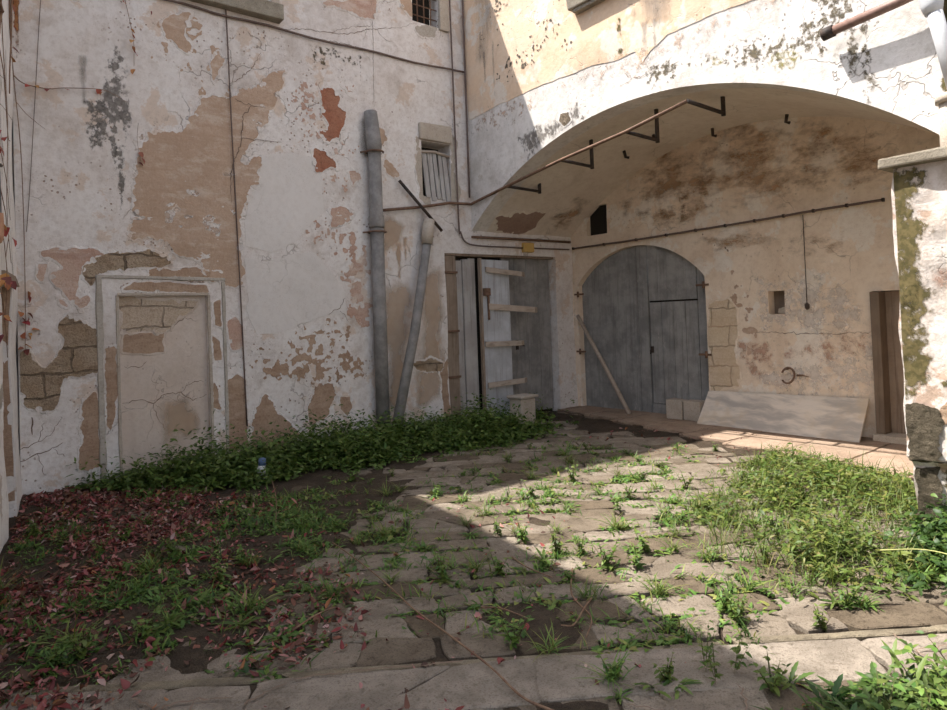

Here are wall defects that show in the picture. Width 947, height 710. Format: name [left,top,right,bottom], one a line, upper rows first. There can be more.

peeling [151,10,203,71]
leakage [580,0,852,83]
leakage [847,24,875,103]
leakage [83,46,131,203]
leakage [647,132,787,198]
peeling [493,210,546,234]
peeling [19,45,373,475]
leakage [901,285,919,335]
crack [122,381,205,429]
crack [20,417,64,474]
flaking render [905,402,947,525]